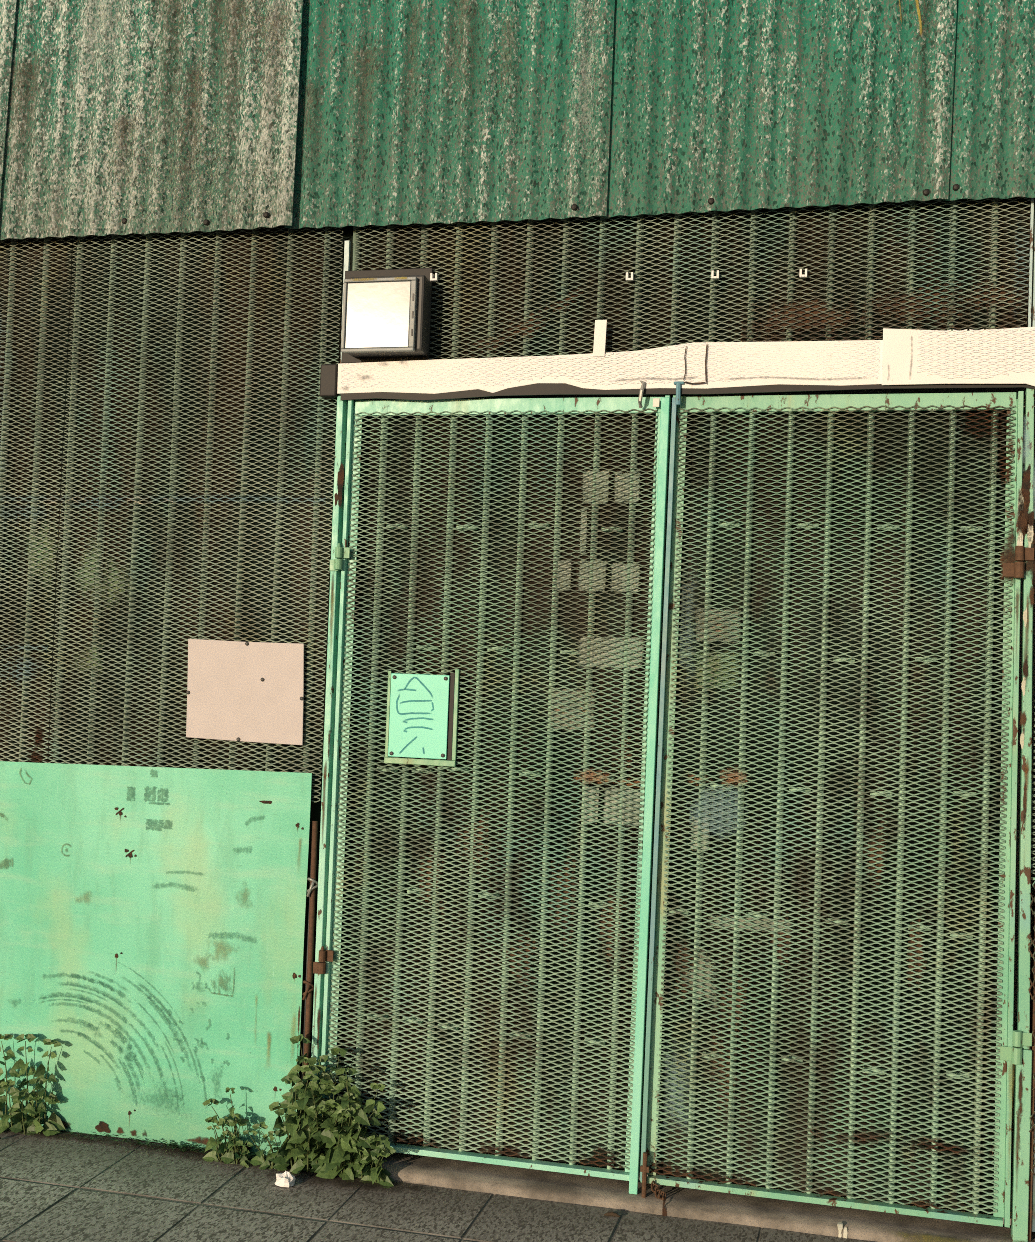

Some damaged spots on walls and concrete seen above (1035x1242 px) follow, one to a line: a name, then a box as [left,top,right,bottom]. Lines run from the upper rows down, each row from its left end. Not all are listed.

corrosion [957,406,1012,482]
corrosion [1000,491,1035,696]
corrosion [1027,884,1035,1047]